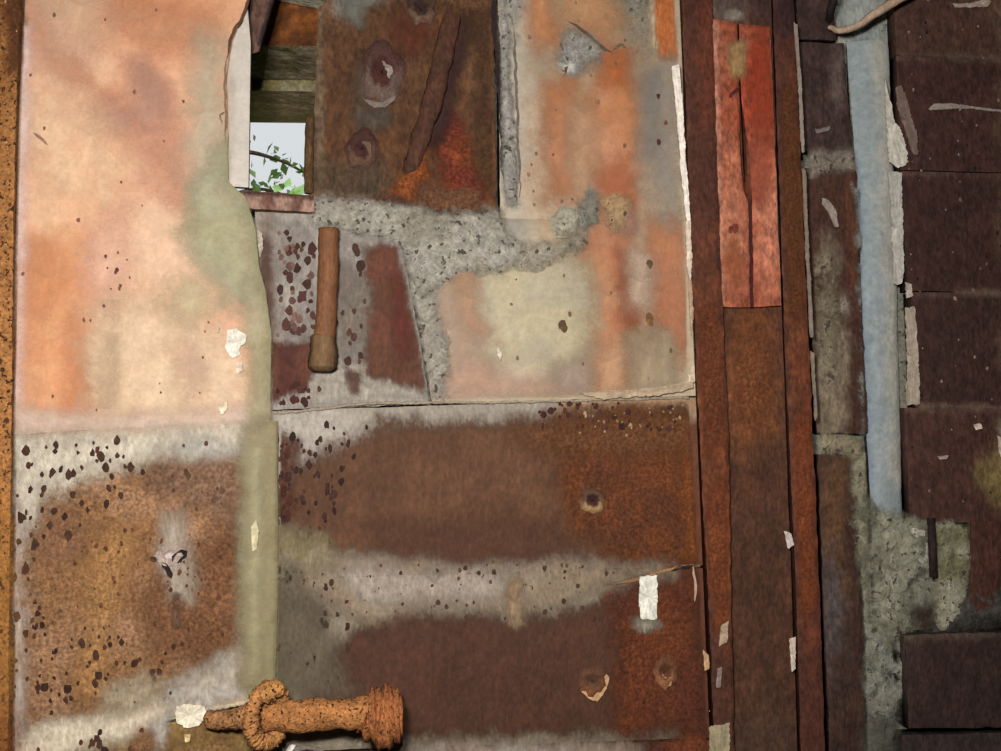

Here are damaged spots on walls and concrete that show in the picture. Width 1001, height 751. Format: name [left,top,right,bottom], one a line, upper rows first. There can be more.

rust [261,239,272,310]
rust [271,342,313,401]
leakage [14,28,680,751]
rust [337,243,425,394]
rust [375,110,487,215]
rust [446,277,495,375]
rust [528,0,686,391]
rust [728,29,770,202]
rust [20,453,247,730]
rust [281,405,707,751]